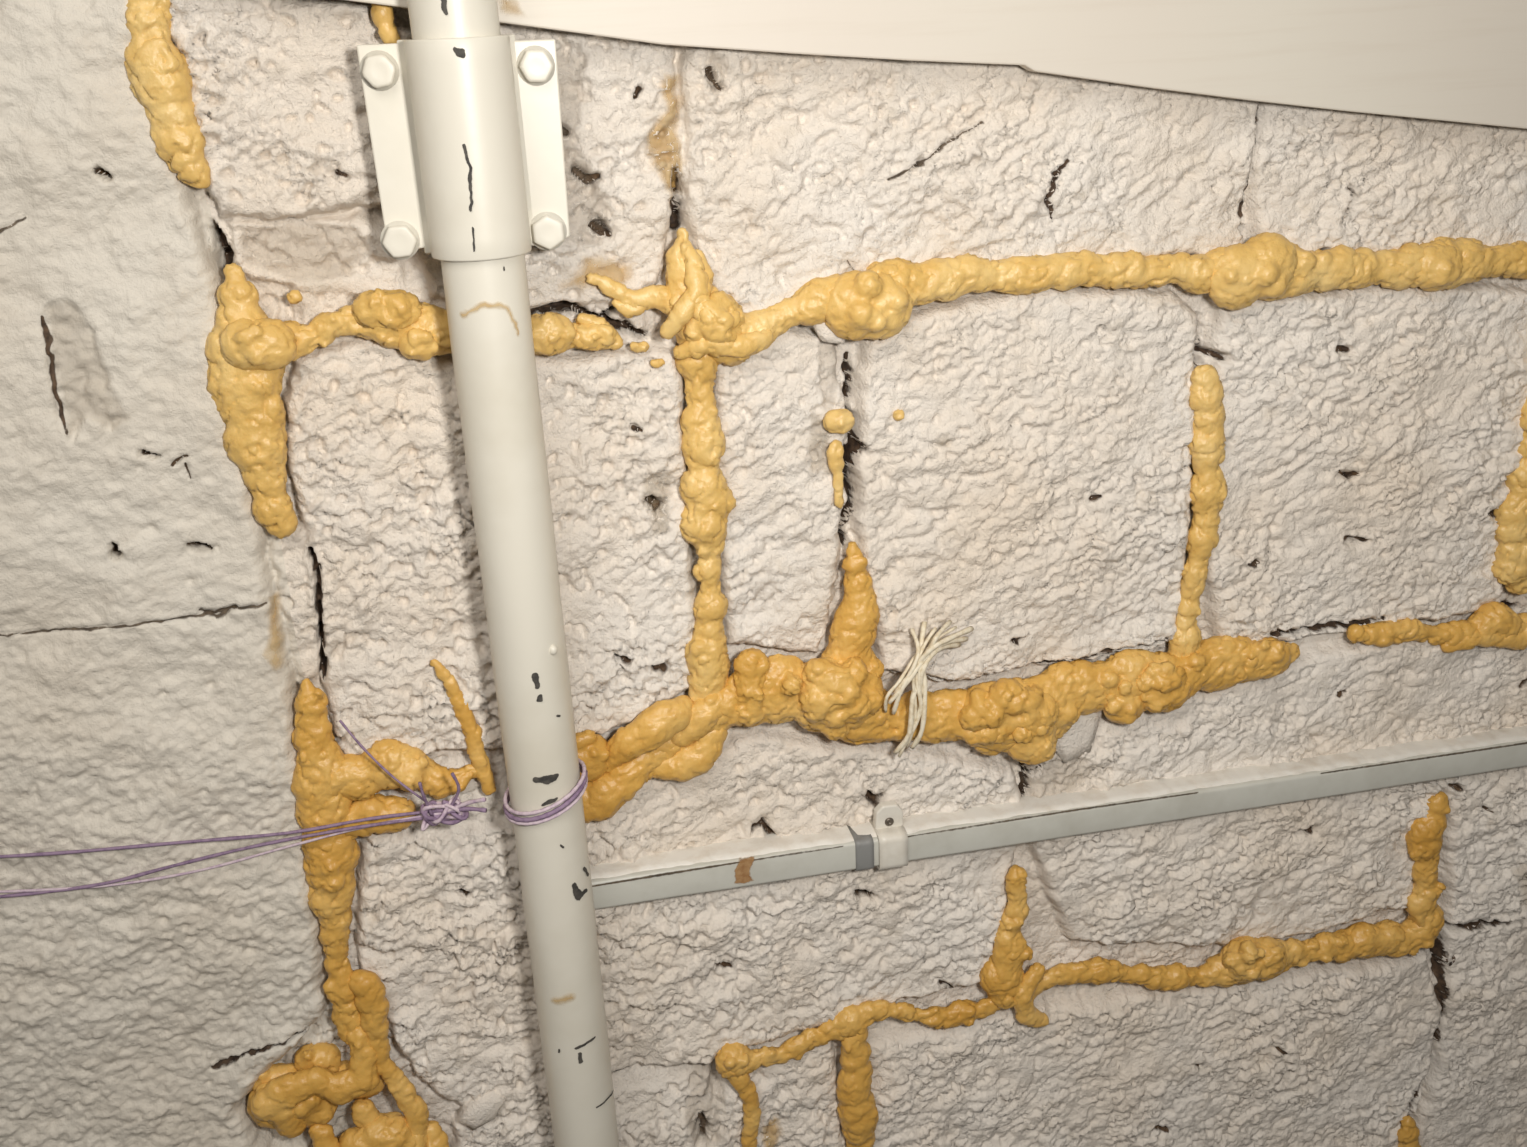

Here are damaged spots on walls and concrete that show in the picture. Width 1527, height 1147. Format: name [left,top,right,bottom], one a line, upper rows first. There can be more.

crack [41,315,68,435]
crack [838,352,866,546]
crack [308,547,327,679]
crack [1429,919,1510,1041]